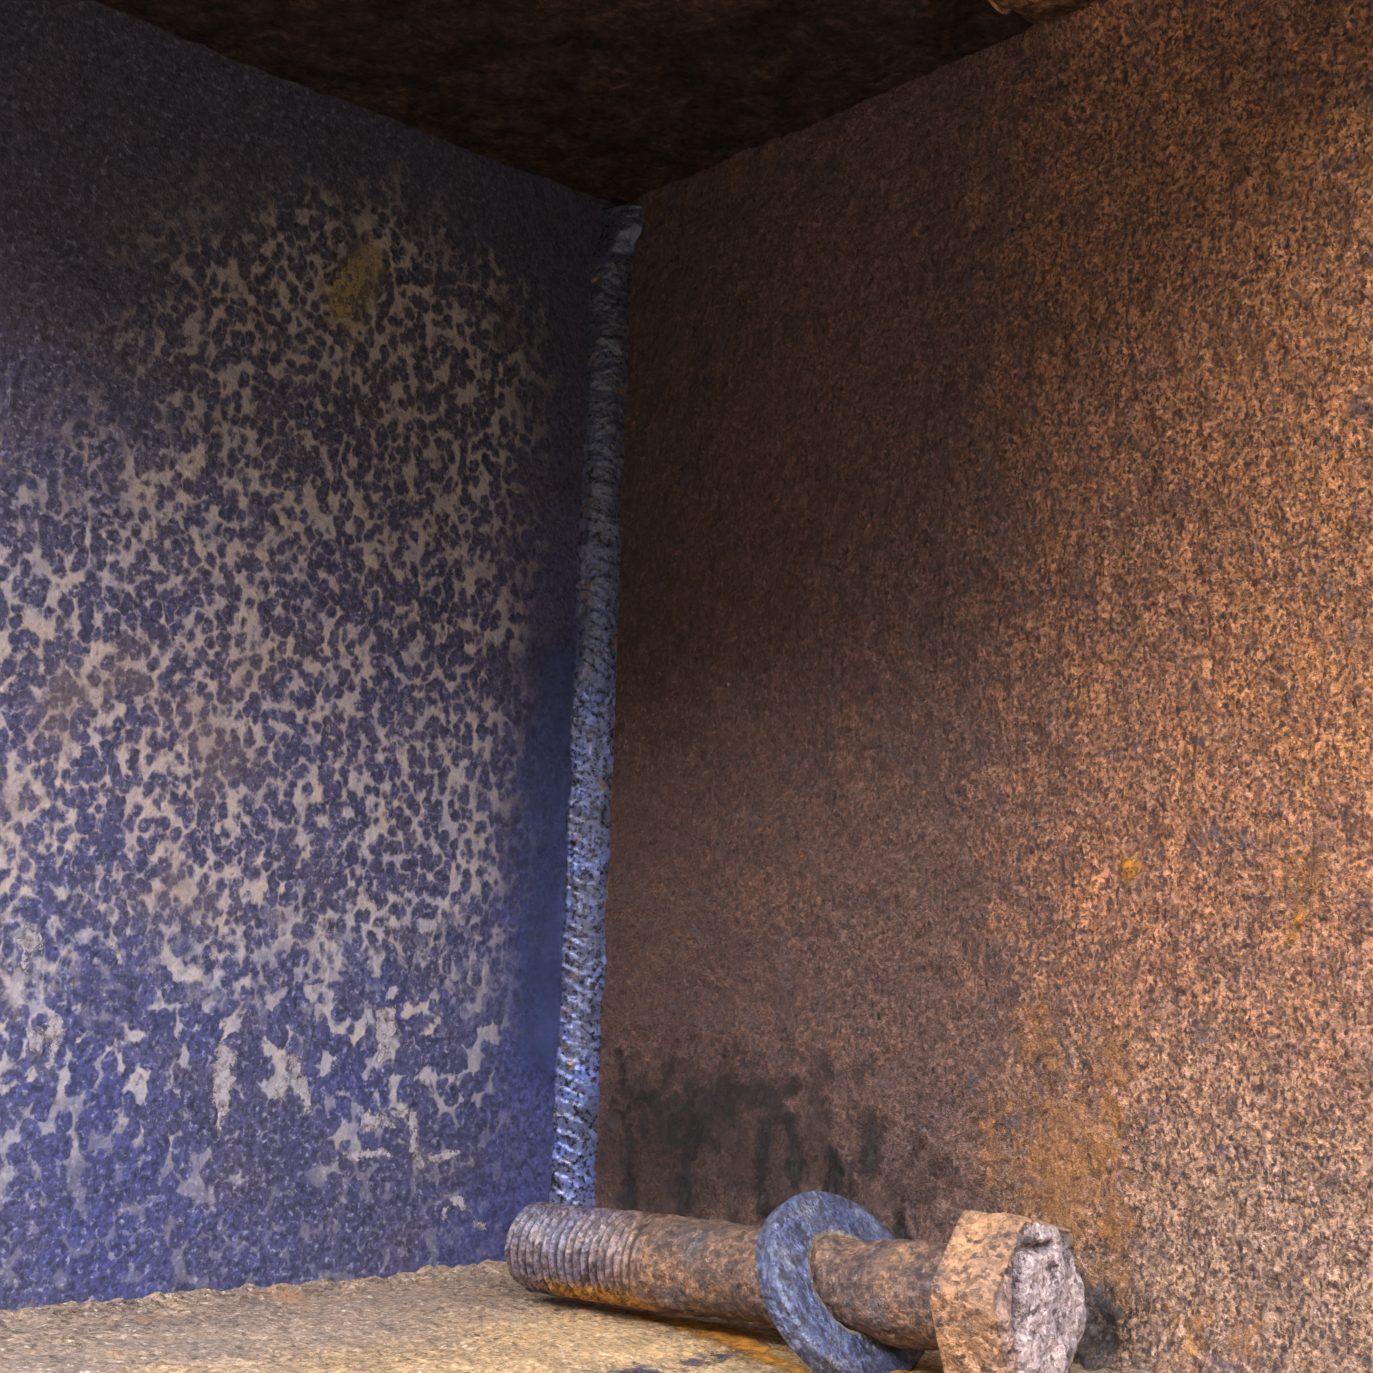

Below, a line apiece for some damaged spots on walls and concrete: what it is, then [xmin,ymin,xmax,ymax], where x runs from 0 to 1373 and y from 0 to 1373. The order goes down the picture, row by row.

water stain [610,1051,802,1216]
water stain [825,1146,843,1195]
corrosion [973,999,1146,1308]
water stain [893,1208,912,1240]
water stain [585,1348,750,1373]
corrosion [619,1308,807,1373]